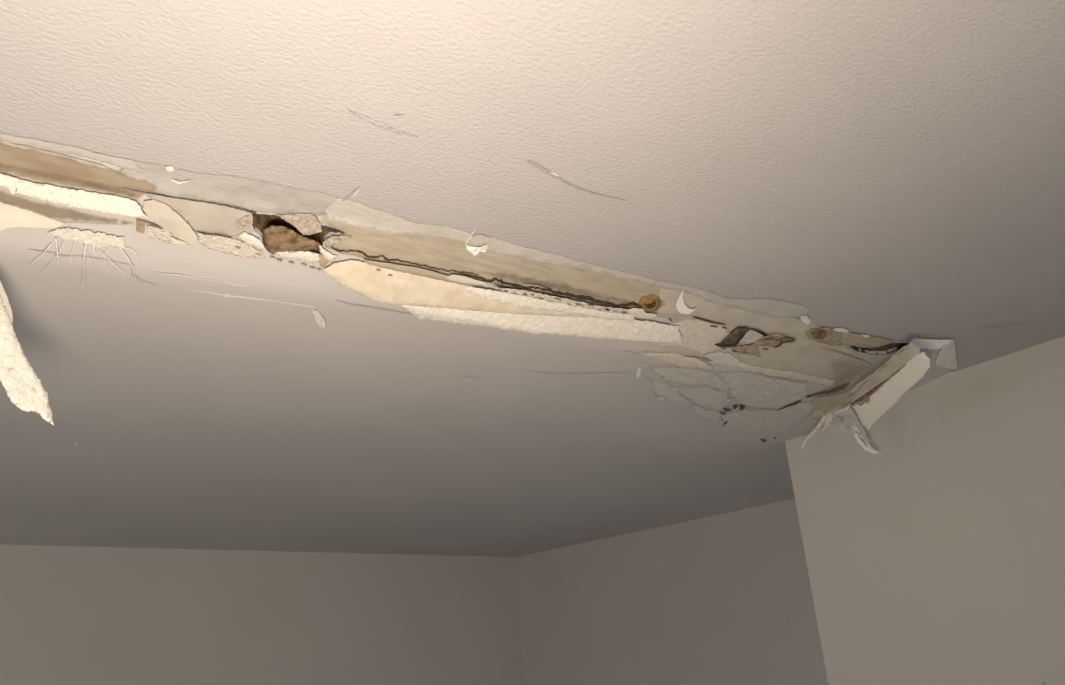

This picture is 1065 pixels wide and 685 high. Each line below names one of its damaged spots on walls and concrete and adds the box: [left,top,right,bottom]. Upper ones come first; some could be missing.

spalling [0,133,909,435]
crack [528,362,850,412]